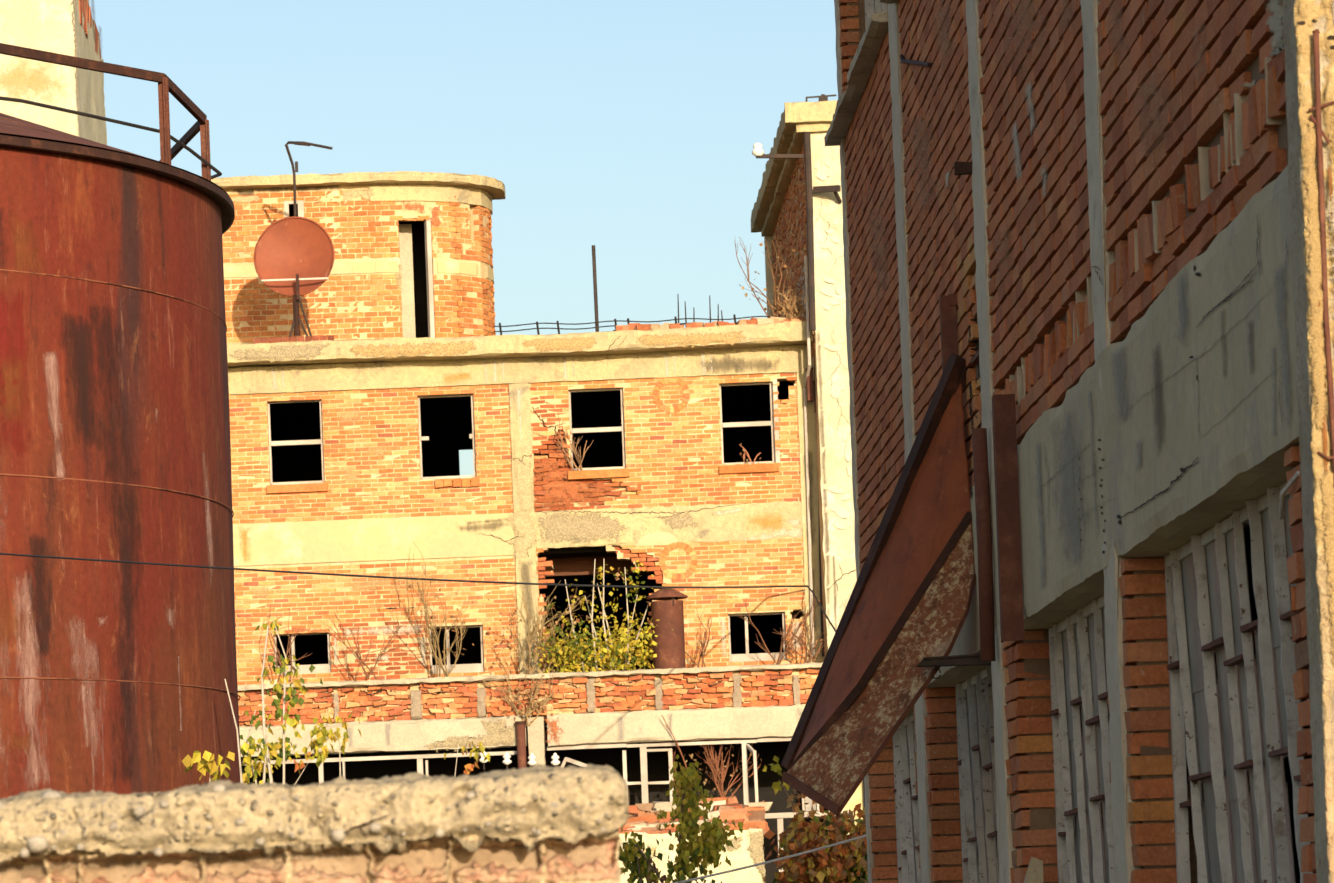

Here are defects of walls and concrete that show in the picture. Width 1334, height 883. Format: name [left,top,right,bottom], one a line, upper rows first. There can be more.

spalling [1109,0,1317,298]
crack [1198,219,1288,326]
spalling [1303,112,1334,429]
spalling [993,277,1094,407]
crack [1120,457,1198,518]